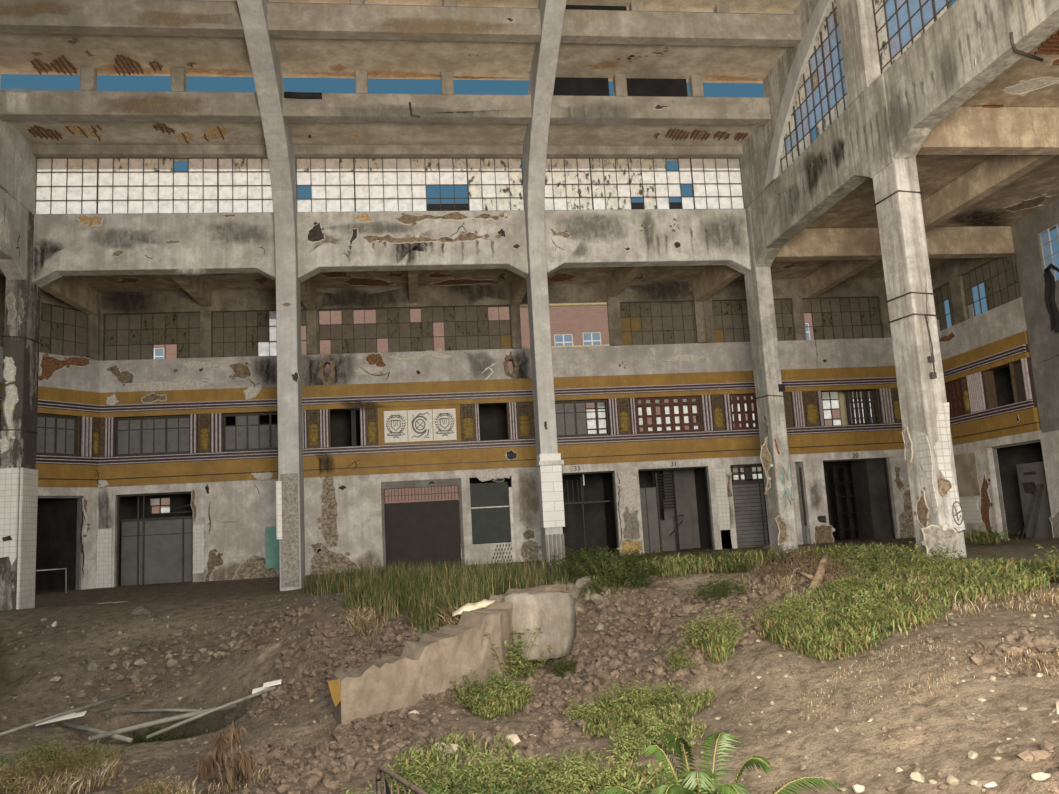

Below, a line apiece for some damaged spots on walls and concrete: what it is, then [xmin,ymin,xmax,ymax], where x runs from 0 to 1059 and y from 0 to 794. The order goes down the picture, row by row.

spalling [31,37,94,76]
spalling [113,55,163,76]
peeling [977,31,1059,108]
spalling [654,128,748,141]
damp [784,92,909,215]
peeling [349,211,521,250]
peeling [38,353,90,381]
peeling [0,357,19,468]
spalling [305,476,361,575]
peeling [893,426,959,559]
spalling [980,472,993,533]
spalling [232,552,280,580]